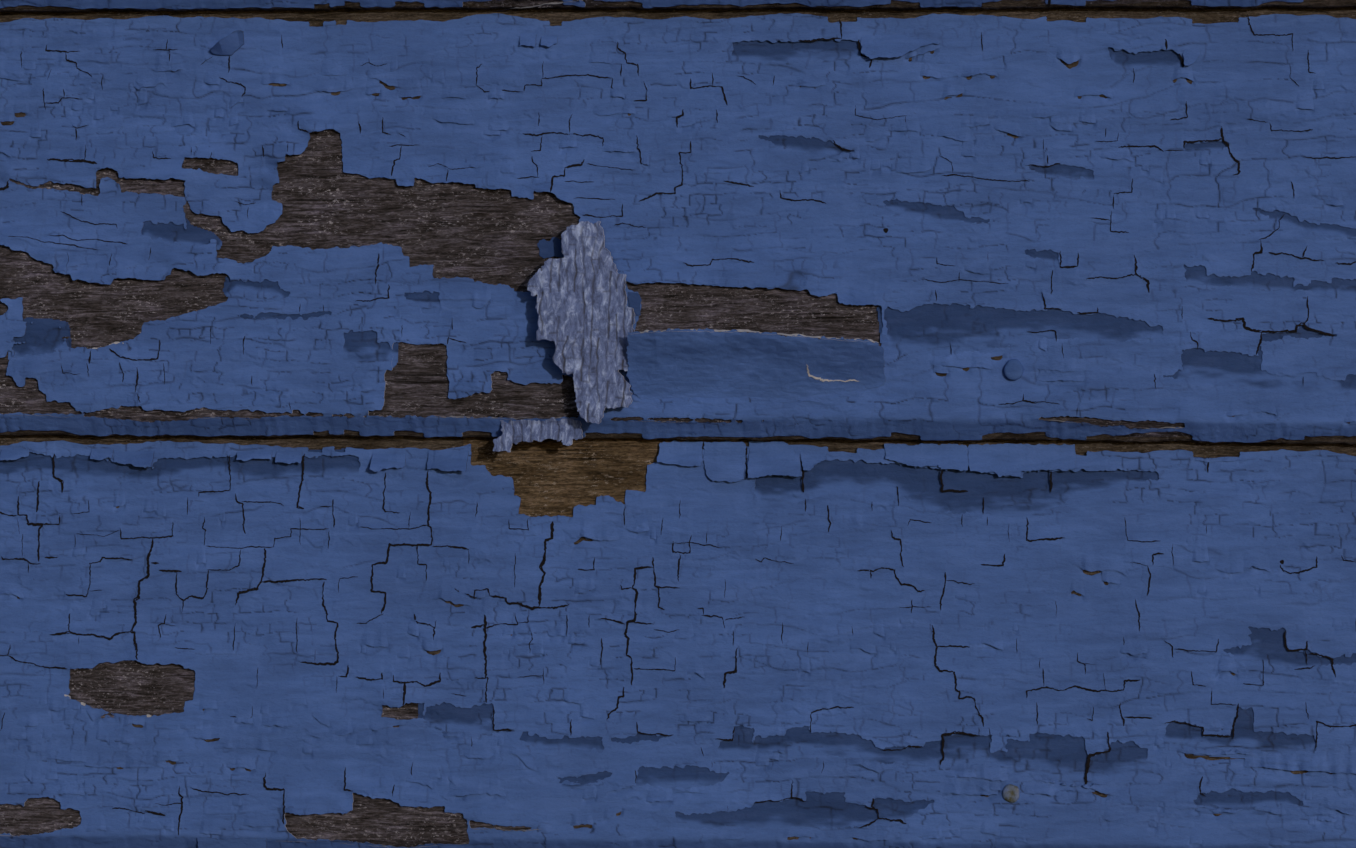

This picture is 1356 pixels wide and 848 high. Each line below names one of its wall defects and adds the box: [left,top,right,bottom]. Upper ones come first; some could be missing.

crack [798,19,872,68]
peeling [0,129,1164,517]
crack [476,42,775,228]
crack [1027,179,1150,357]
crack [1097,101,1356,272]
crack [1181,296,1335,355]
peeling [1039,415,1188,437]
peeling [64,660,195,718]
crack [857,466,1063,765]
crack [1016,520,1336,785]
crack [112,773,285,835]
peeling [197,793,538,848]